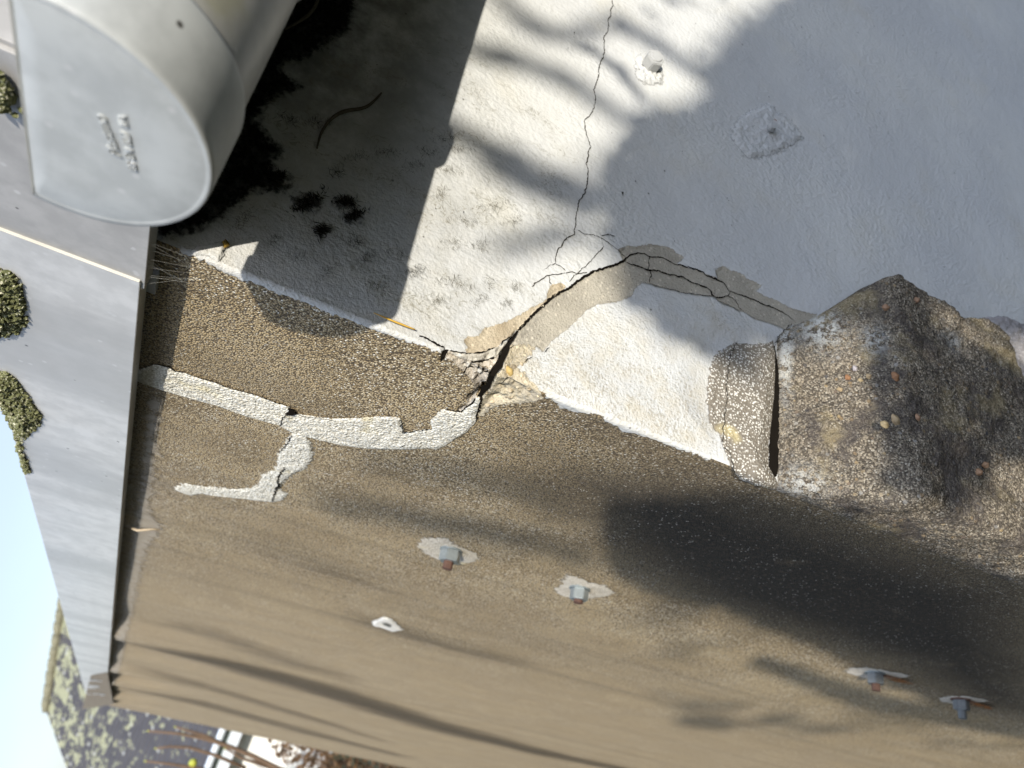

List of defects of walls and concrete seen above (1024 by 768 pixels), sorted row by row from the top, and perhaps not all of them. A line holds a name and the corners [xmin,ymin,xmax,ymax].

peeling [191,242,225,262]
leakage [158,0,382,265]
peeling [420,244,817,416]
crack [476,1,795,421]
crack [722,342,741,481]